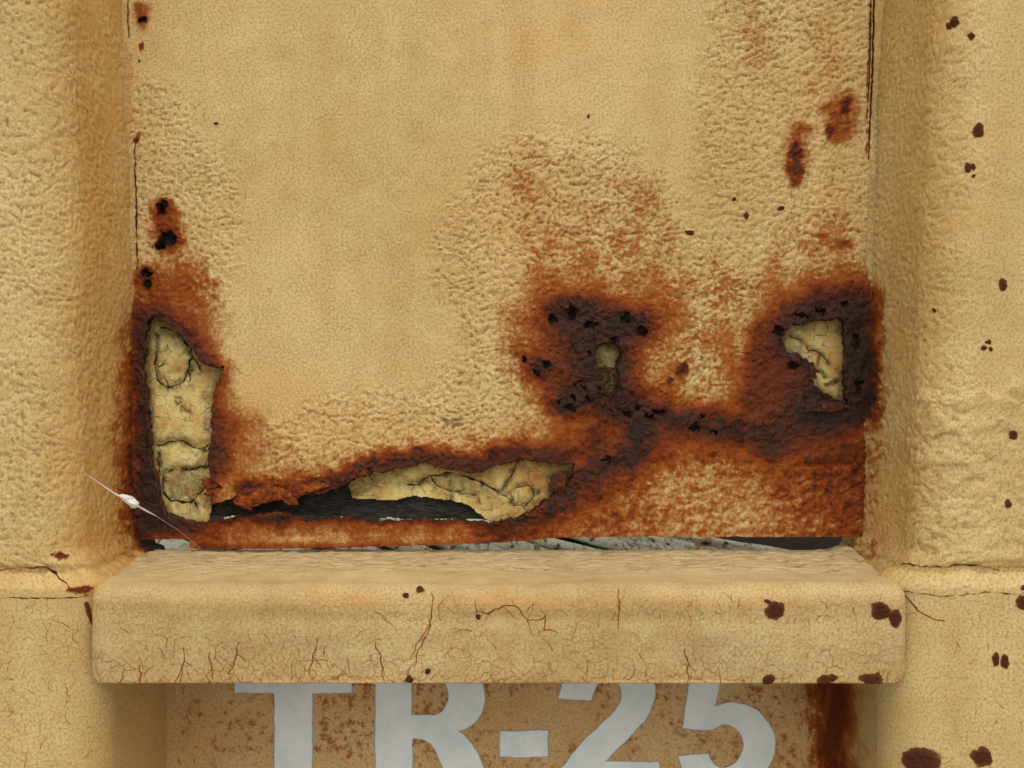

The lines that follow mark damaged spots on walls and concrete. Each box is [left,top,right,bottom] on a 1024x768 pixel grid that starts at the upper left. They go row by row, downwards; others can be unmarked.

rust [785,3,872,187]
rust [111,168,887,559]
peeling [786,353,820,379]
peeling [233,466,370,510]
rust [66,585,94,625]
crack [764,591,857,627]
crack [0,566,743,767]
rust [315,683,375,758]
rust [728,683,861,768]